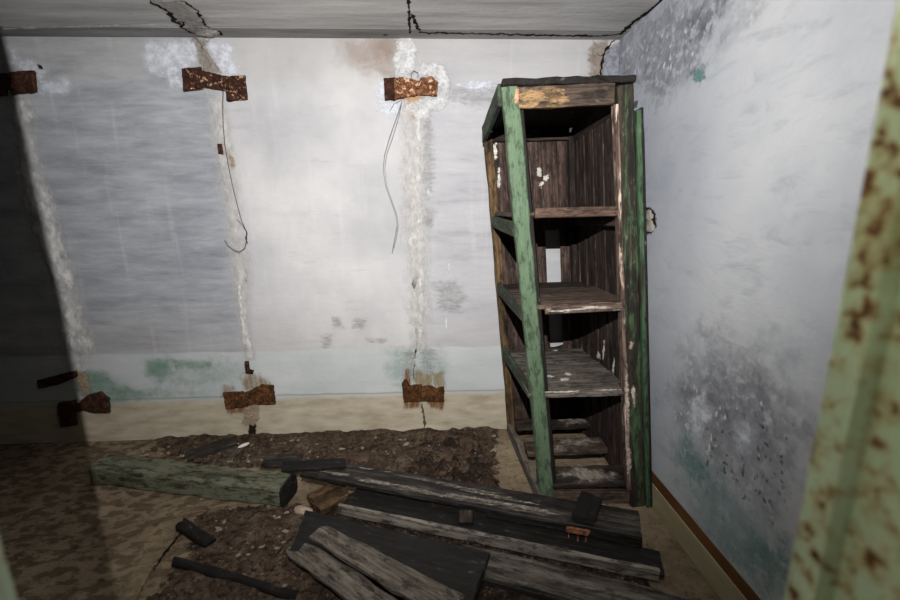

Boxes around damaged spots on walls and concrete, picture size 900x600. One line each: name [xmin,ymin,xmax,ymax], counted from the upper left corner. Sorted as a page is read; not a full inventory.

crack [150,1,223,49]
crack [406,0,662,75]